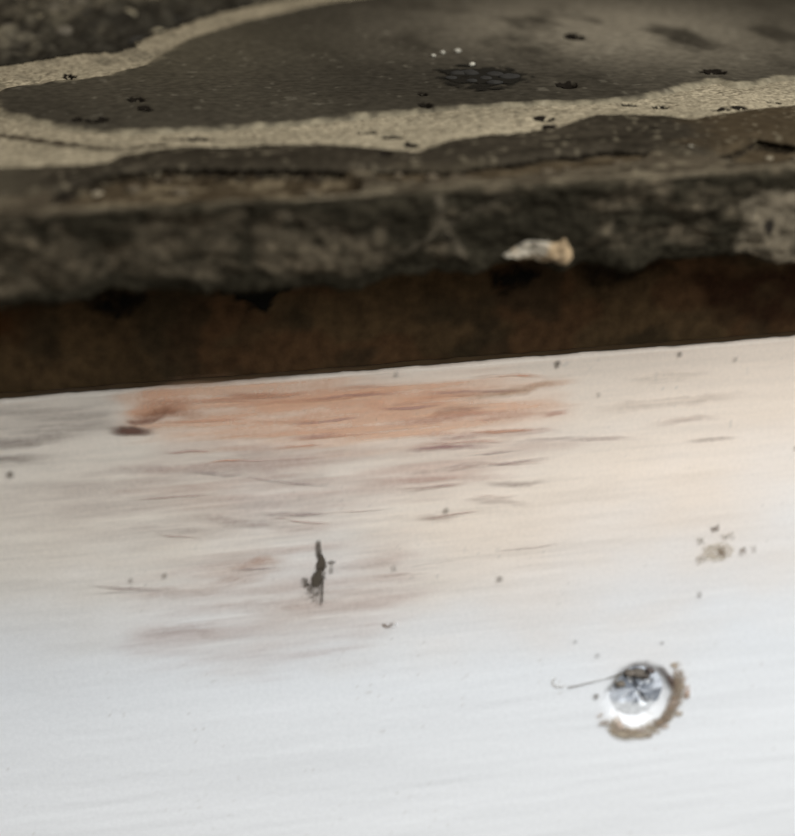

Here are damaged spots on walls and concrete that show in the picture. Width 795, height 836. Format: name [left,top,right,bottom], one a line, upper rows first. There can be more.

spalling [533,116,556,130]
spalling [358,131,418,148]
spalling [719,139,795,163]
spalling [458,152,647,179]
spalling [48,169,361,206]
corrosion [116,383,517,438]